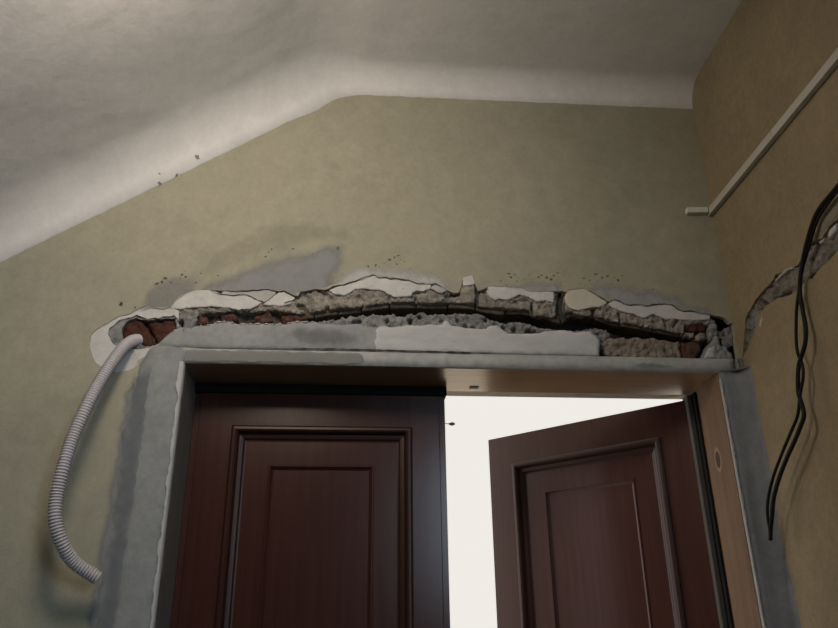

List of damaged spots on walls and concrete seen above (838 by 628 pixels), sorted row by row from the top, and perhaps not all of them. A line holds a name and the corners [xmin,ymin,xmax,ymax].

flaking render [819,223,838,245]
crack [212,274,447,303]
spalling [90,255,734,372]